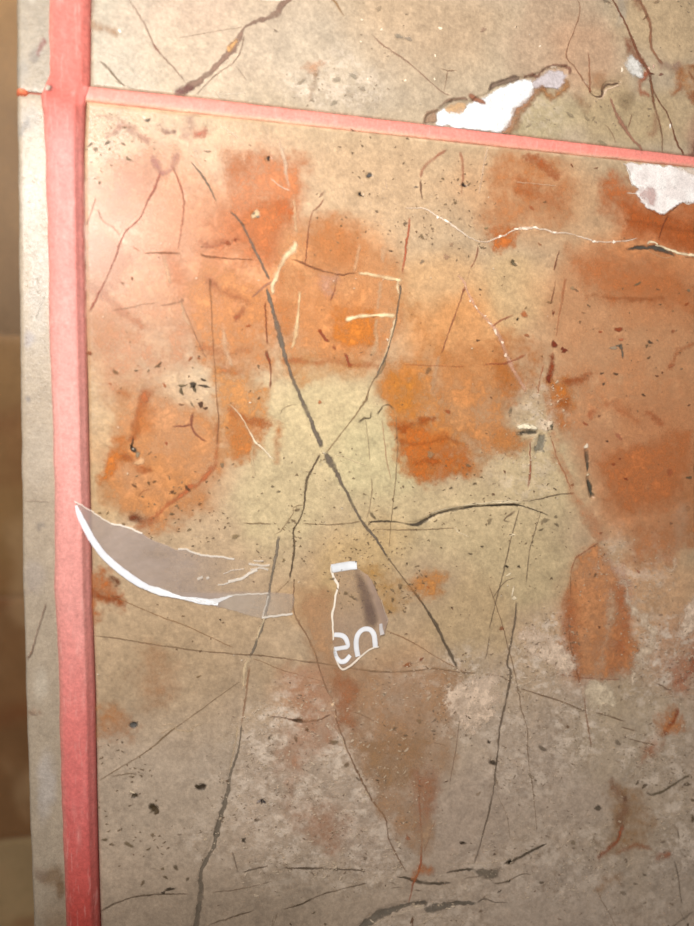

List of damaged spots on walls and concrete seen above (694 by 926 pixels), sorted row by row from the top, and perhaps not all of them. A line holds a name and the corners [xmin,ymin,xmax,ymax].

crack [138,0,291,94]
spalling [420,64,571,133]
crack [566,0,684,154]
spalling [621,56,643,78]
crack [90,164,215,309]
rust [210,156,401,384]
spalling [626,162,694,216]
rust [99,369,268,532]
rust [378,347,526,480]
crack [103,181,694,926]
rust [566,545,638,679]
peeling [193,684,496,926]